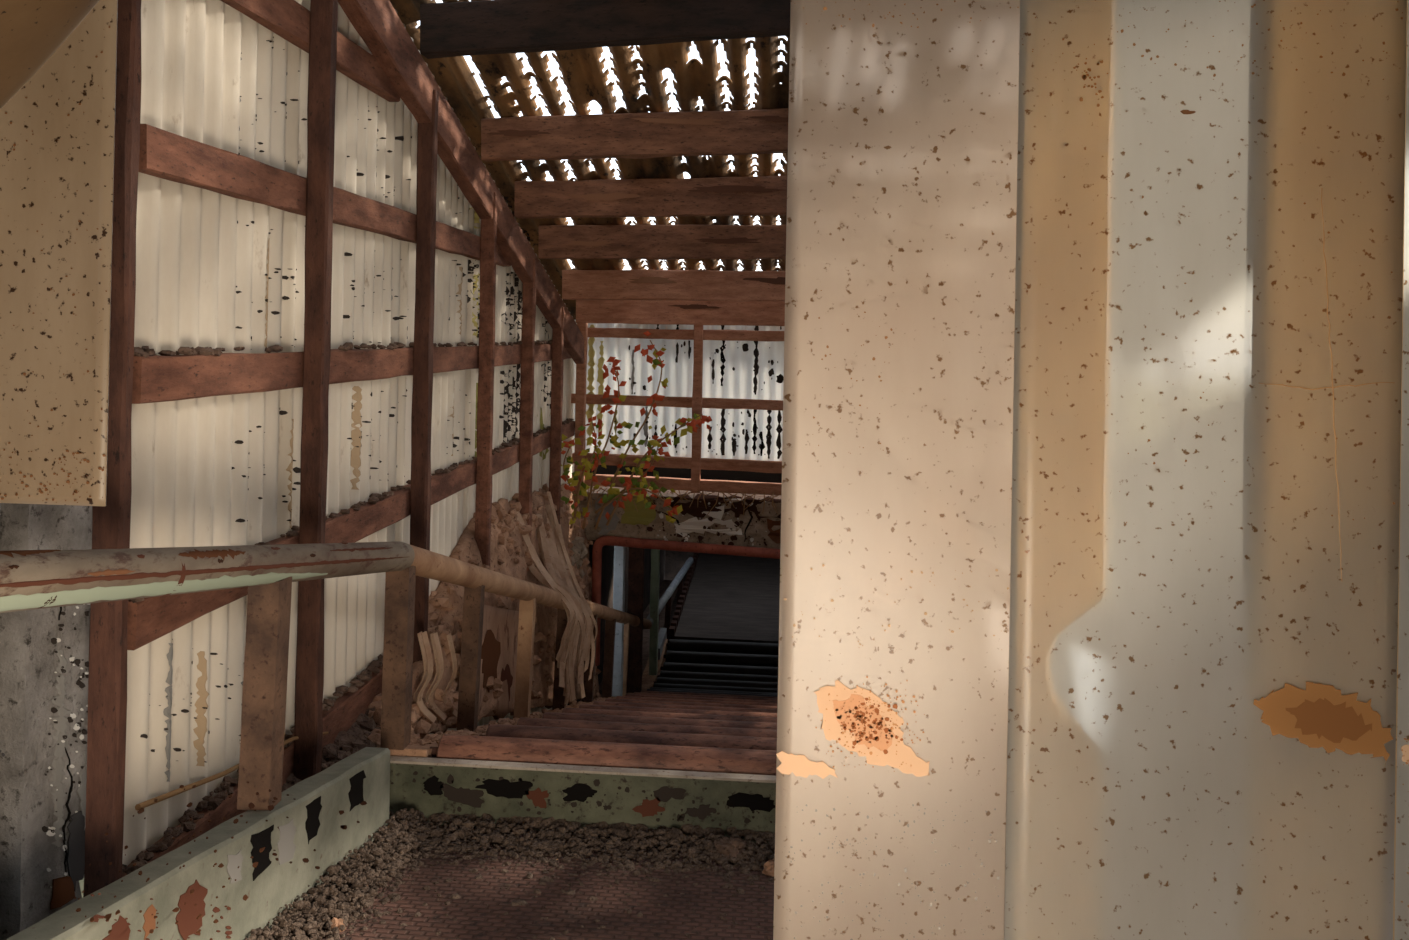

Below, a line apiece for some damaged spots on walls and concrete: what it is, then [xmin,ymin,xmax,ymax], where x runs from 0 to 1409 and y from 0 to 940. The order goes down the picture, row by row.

corrosion [814,676,930,777]
corrosion [1253,682,1409,765]
peeling [226,796,322,884]
peeling [348,770,366,811]
peeling [412,771,776,826]